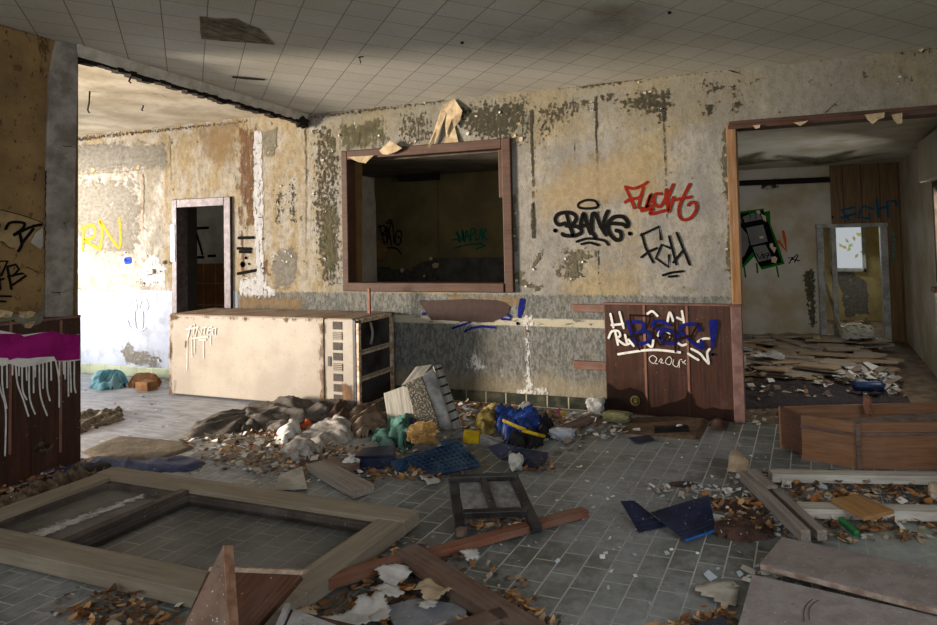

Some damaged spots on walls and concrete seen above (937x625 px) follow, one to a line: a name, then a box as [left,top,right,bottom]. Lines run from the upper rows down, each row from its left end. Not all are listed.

spalling [135,254,168,292]
peeling [78,120,248,256]
peeling [239,131,297,298]
peeling [319,199,342,290]
damp [738,151,876,166]
peeling [803,268,818,329]
peeling [831,272,870,317]